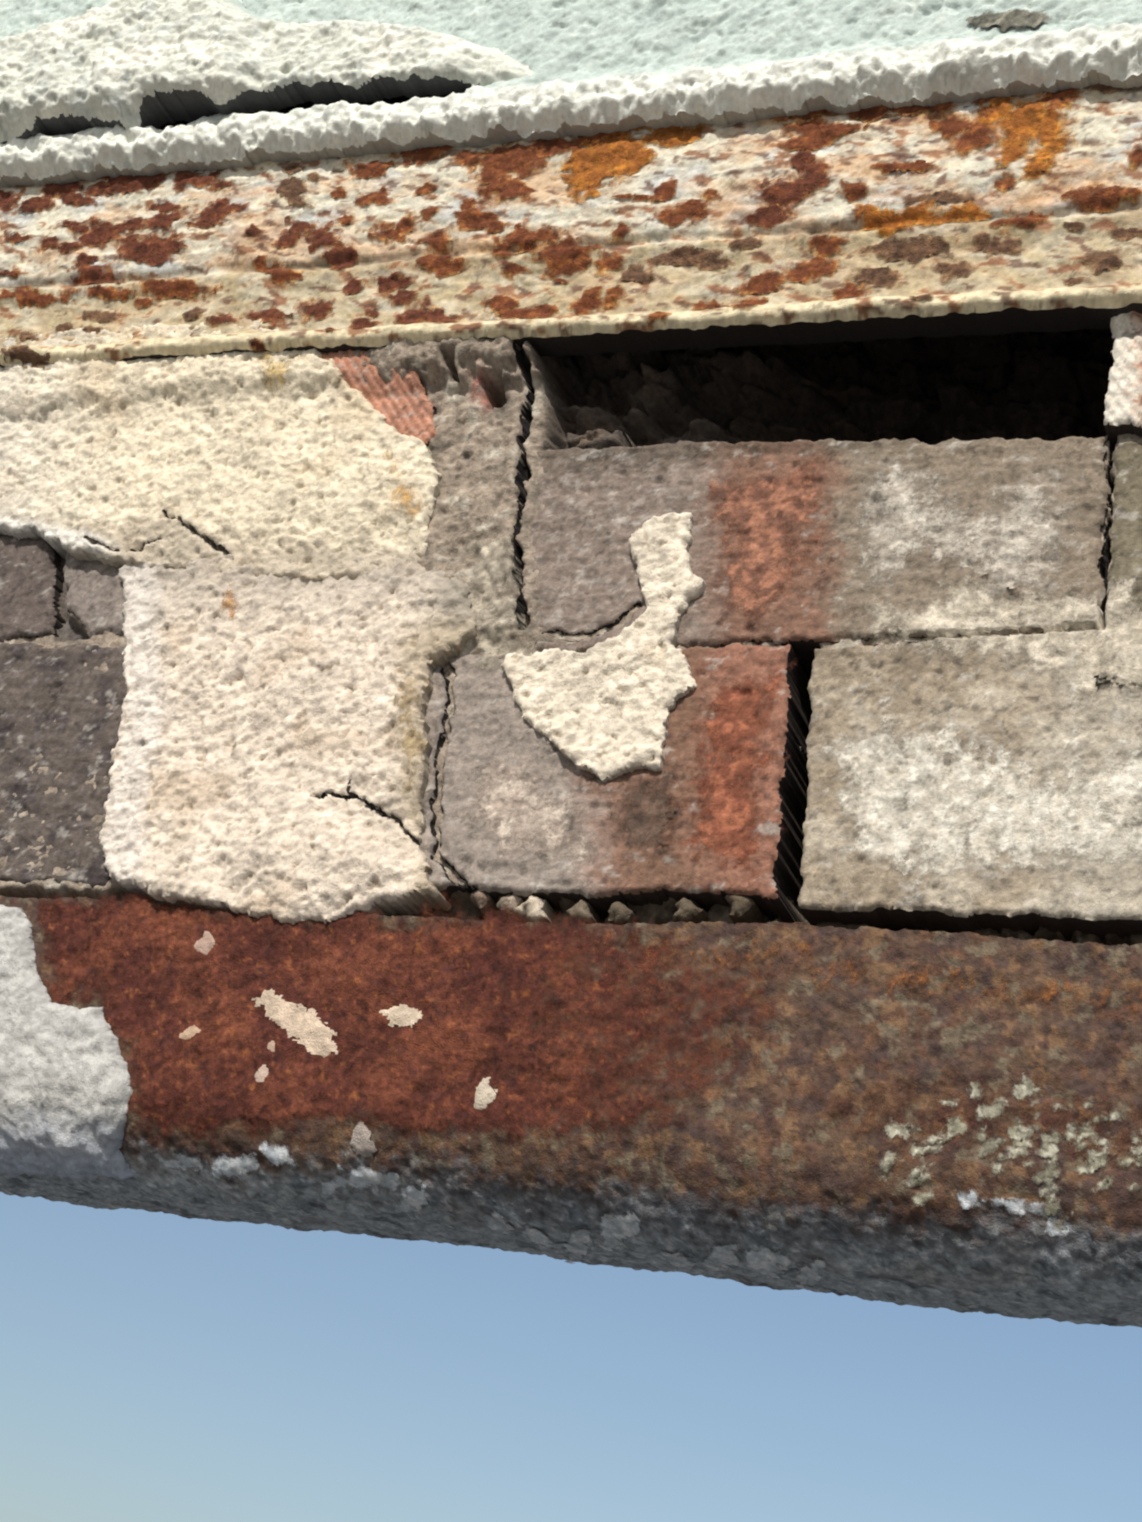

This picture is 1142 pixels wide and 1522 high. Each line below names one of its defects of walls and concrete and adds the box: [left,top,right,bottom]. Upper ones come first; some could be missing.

rust [0,83,1142,389]
crack [511,341,642,643]
crack [315,663,478,894]
rust [37,892,775,1145]
rust [819,1069,1142,1165]